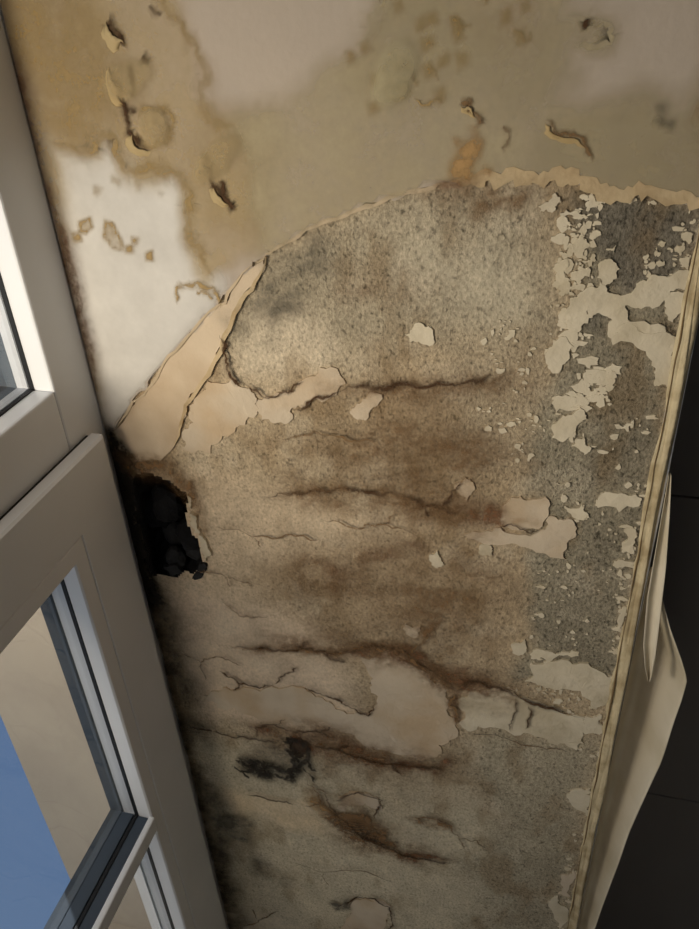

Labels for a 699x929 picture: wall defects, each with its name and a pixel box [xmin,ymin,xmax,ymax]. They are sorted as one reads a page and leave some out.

leakage [10,0,699,302]
crack [222,341,486,411]
leakage [108,430,200,616]
crack [223,529,316,545]
crack [275,484,460,531]
peeling [109,165,699,929]
crack [186,636,575,750]
leakage [234,738,316,783]
crack [187,720,441,774]
crack [250,782,446,864]
crack [413,817,482,847]
crack [293,862,394,929]